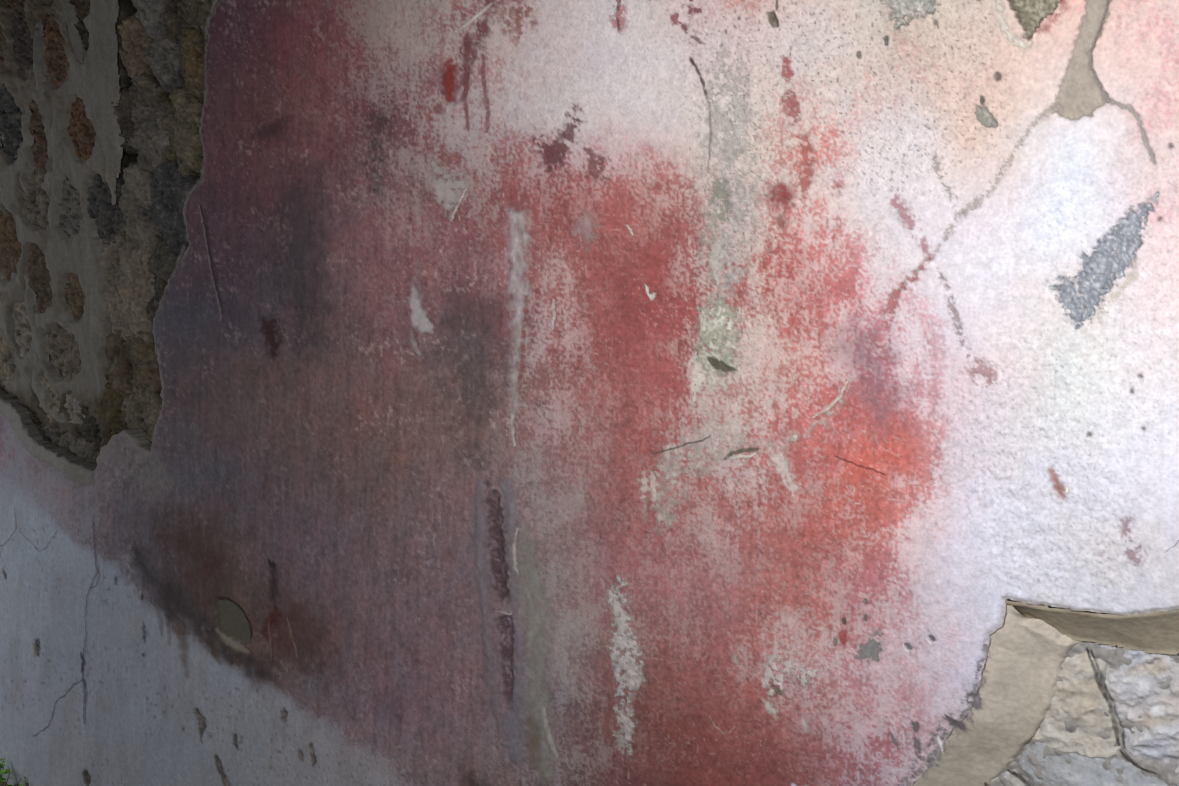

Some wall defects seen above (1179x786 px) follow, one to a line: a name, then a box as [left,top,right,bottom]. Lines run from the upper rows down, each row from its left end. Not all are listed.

flaking render [881,0,938,46]
flaking render [995,0,1064,48]
flaking render [0,0,220,485]
crack [883,0,1156,387]
flaking render [1049,192,1161,329]
crack [34,519,99,736]
flaking render [898,599,1179,786]